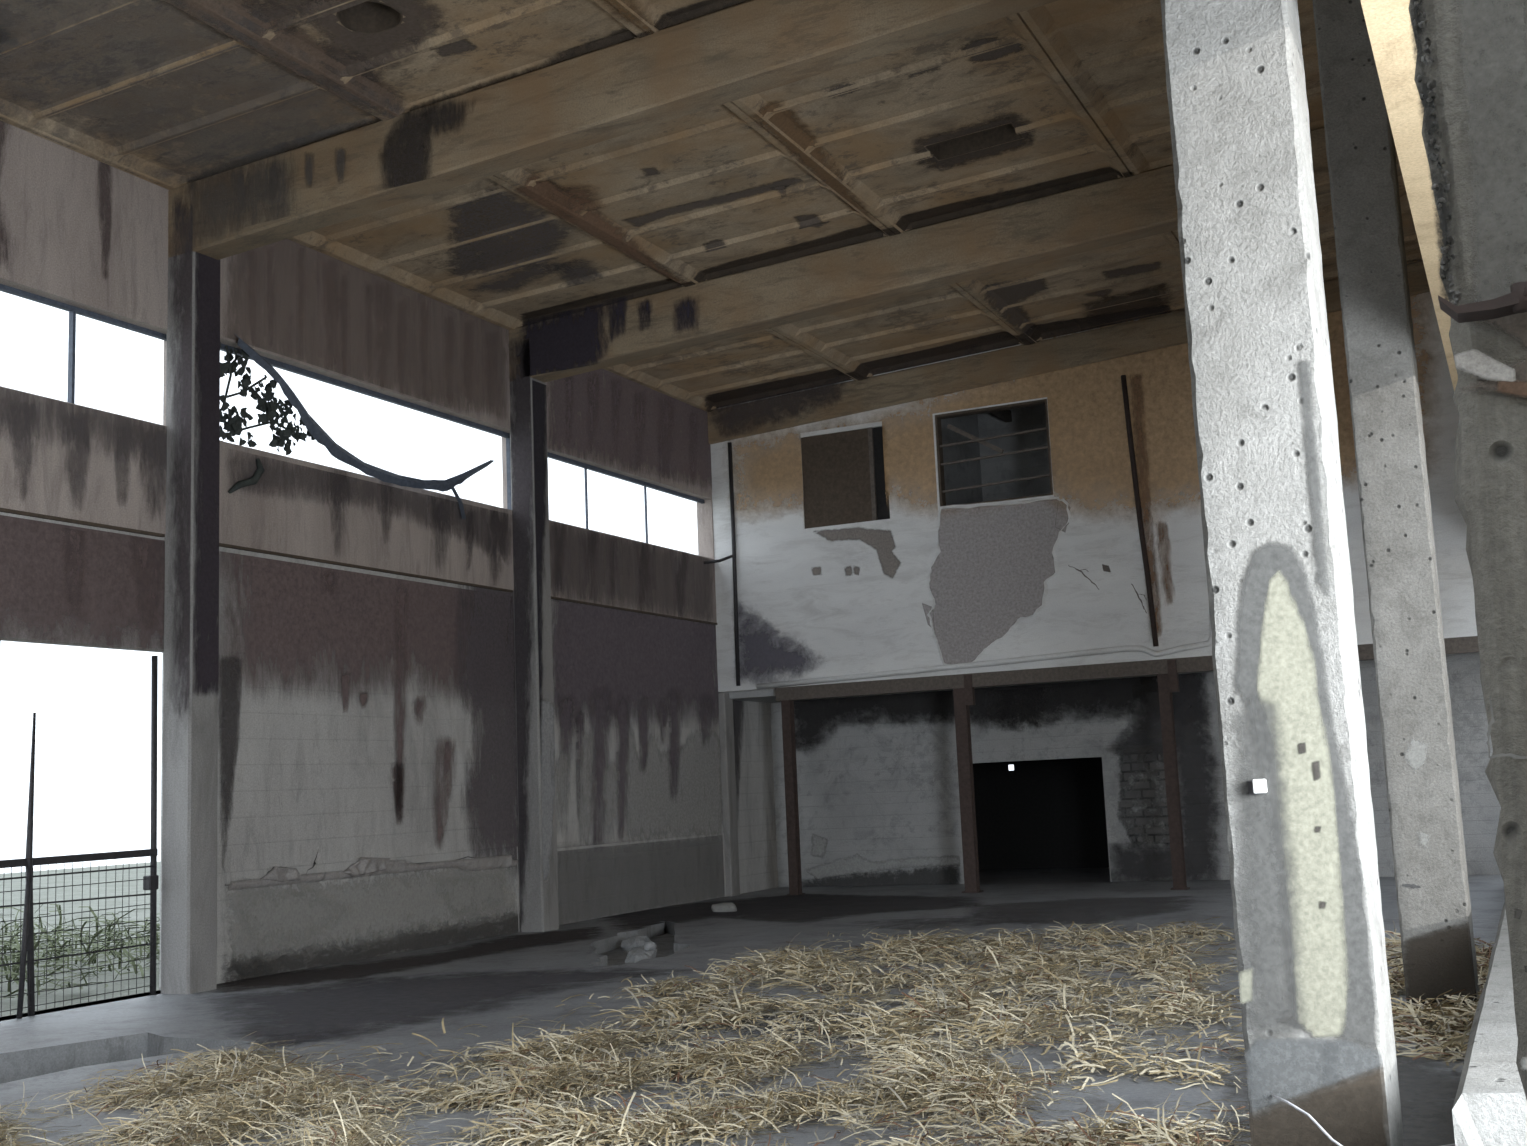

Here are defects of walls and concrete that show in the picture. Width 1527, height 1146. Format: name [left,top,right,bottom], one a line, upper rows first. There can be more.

water stain [99,162,111,278]
water stain [426,102,466,134]
spalling [1411,0,1461,306]
water stain [116,427,167,509]
spalling [817,527,900,578]
peeling [922,496,1071,671]
water stain [219,658,241,851]
water stain [393,587,424,821]
water stain [435,585,519,871]
water stain [217,687,1185,1046]
peeling [1258,572,1347,1037]
peeling [1239,969,1252,1003]